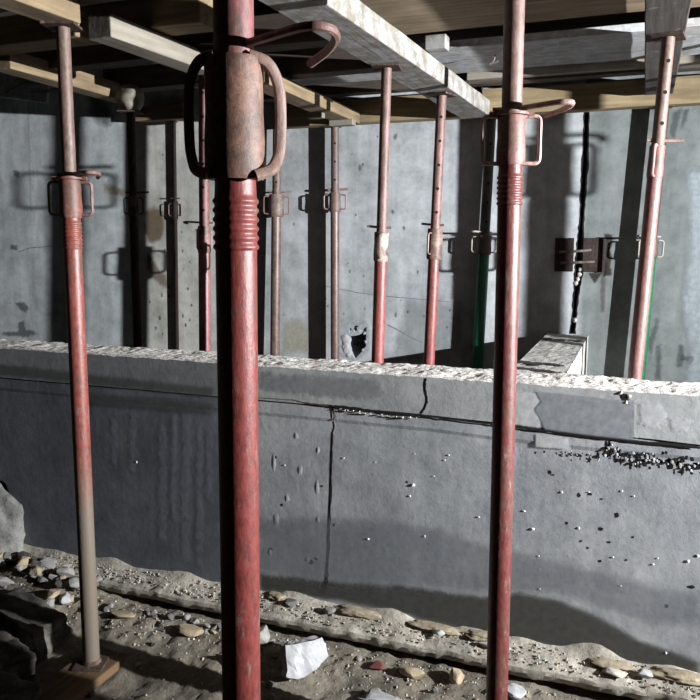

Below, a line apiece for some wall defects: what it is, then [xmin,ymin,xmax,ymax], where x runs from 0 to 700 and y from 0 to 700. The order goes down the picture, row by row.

spalling [341,326,367,358]
crack [515,425,700,449]
crack [258,378,492,588]